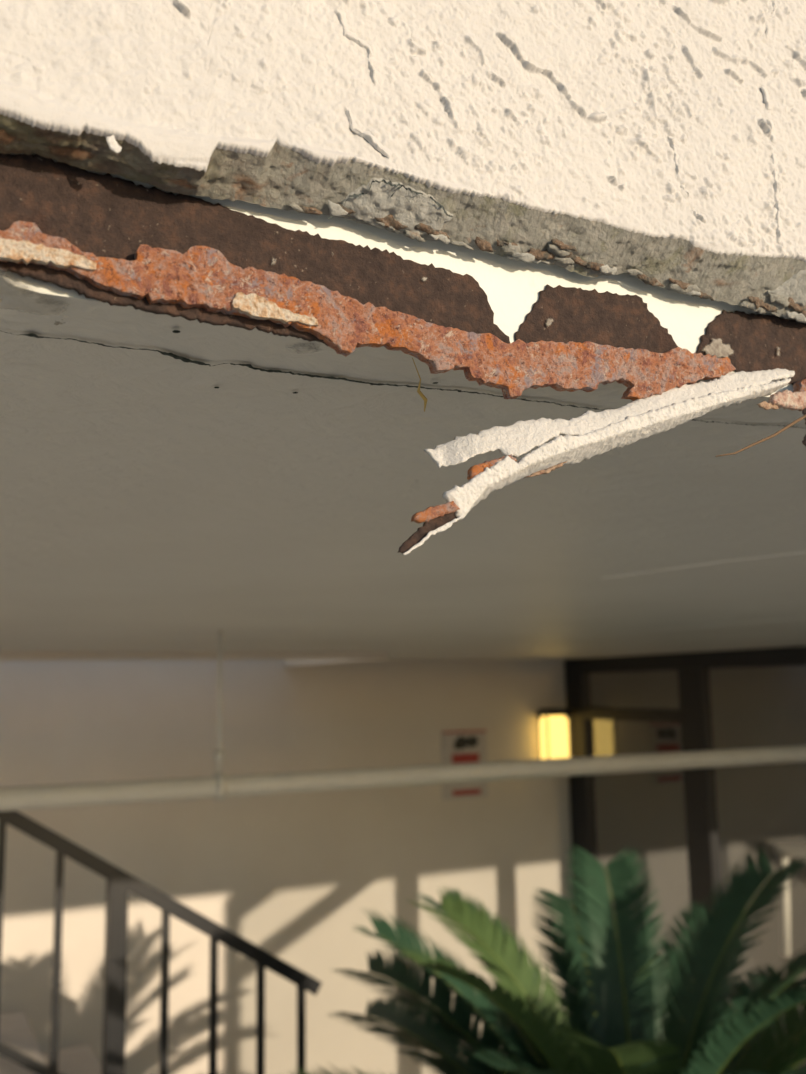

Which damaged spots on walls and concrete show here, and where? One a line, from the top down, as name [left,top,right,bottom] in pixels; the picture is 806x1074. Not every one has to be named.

peeling [106,135,122,154]
rust [0,131,806,401]
spalling [287,178,714,301]
spalling [738,270,806,323]
crack [2,331,600,410]
peeling [397,368,795,555]
crack [692,419,806,429]
rust [756,401,779,410]